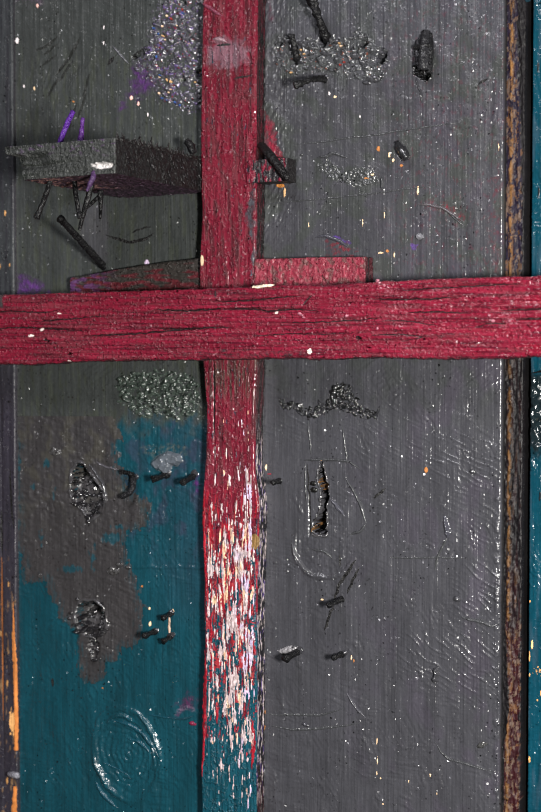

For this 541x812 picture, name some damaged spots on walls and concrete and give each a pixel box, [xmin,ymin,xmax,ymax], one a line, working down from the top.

crack [0,284,541,349]
peeling [201,466,266,809]